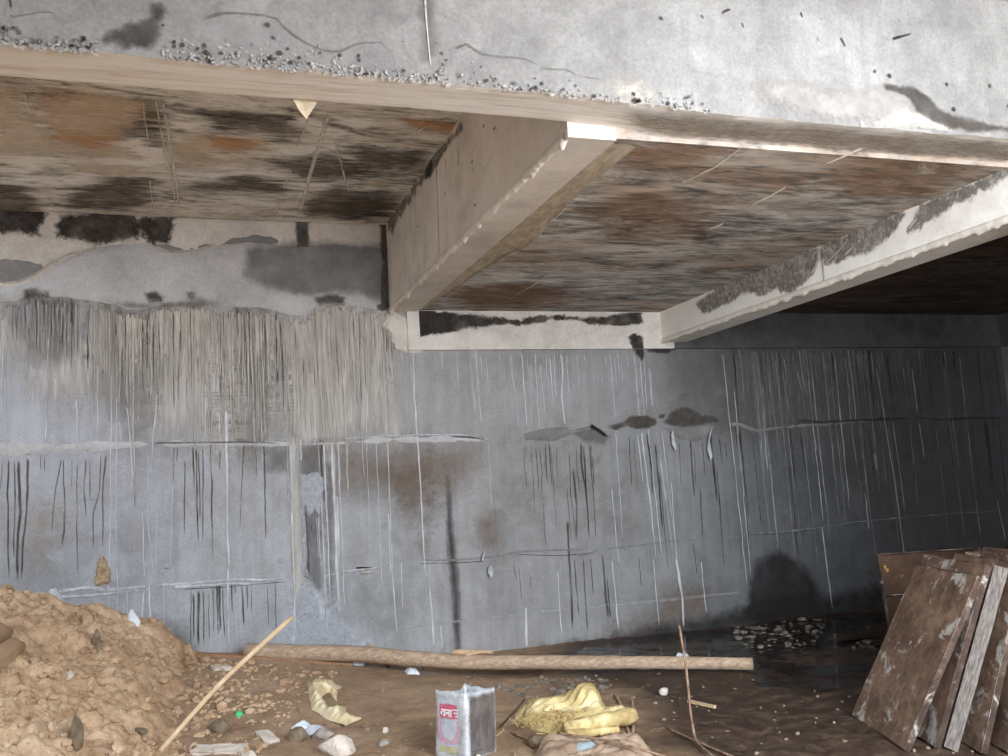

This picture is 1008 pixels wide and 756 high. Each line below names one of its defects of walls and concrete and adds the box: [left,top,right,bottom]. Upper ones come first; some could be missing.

spalling [171,40,223,62]
damp [116,99,166,147]
damp [202,111,301,139]
damp [0,124,462,646]
damp [634,554,884,637]